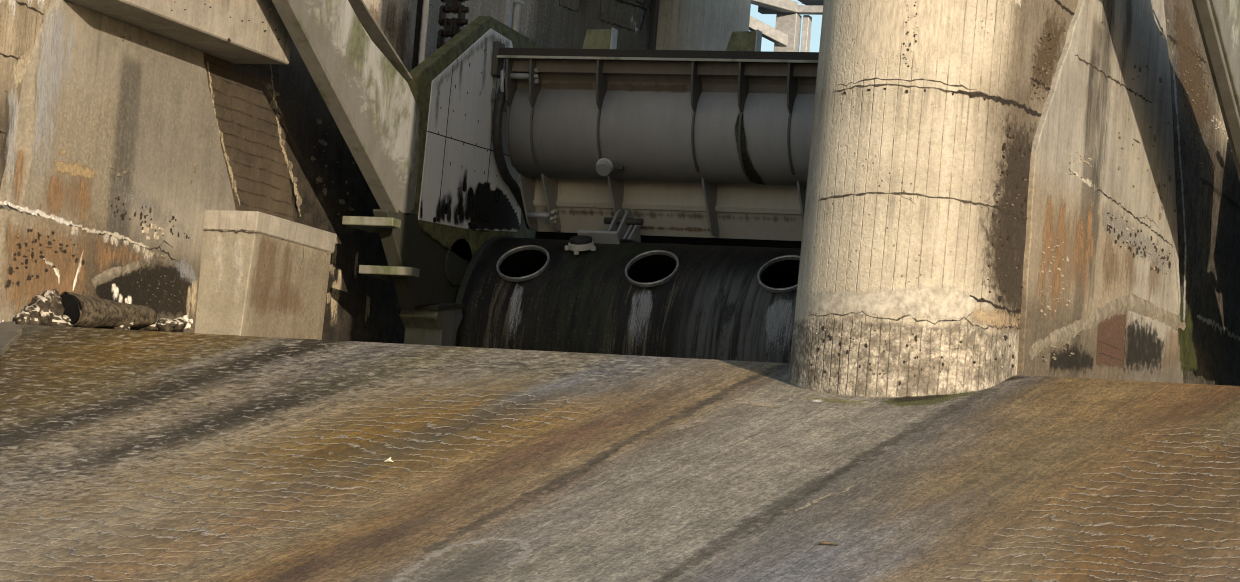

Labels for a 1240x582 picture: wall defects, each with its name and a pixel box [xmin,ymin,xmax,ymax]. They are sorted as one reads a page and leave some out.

crack [11,0,44,15]
crack [1042,0,1075,16]
crack [834,77,1051,117]
crack [1075,54,1152,103]
crack [819,192,1010,213]
spalling [788,119,1037,397]
peeling [1039,237,1071,316]
corrosion [1037,200,1093,301]
water stain [509,288,522,324]
water stain [629,293,652,334]
spalling [1096,312,1127,371]